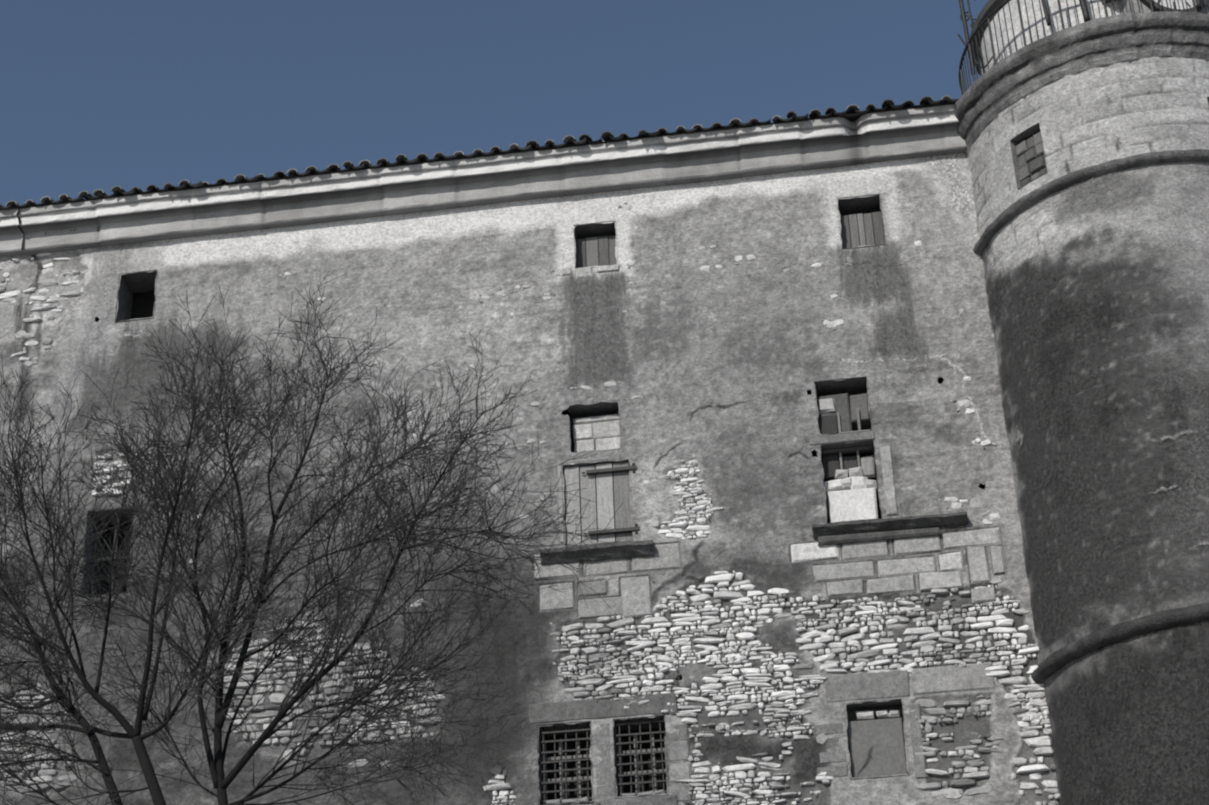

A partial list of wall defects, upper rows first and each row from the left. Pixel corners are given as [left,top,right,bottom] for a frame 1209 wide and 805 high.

crack [0,208,45,301]
flaking render [0,253,89,368]
leakage [565,271,681,389]
flaking render [91,454,134,499]
flaking render [650,459,724,539]
leakage [986,230,1209,648]
flaking render [216,611,445,766]
flaking render [346,759,391,768]
flaking render [483,765,516,805]
flaking render [550,571,1061,805]
leakage [1049,620,1209,805]